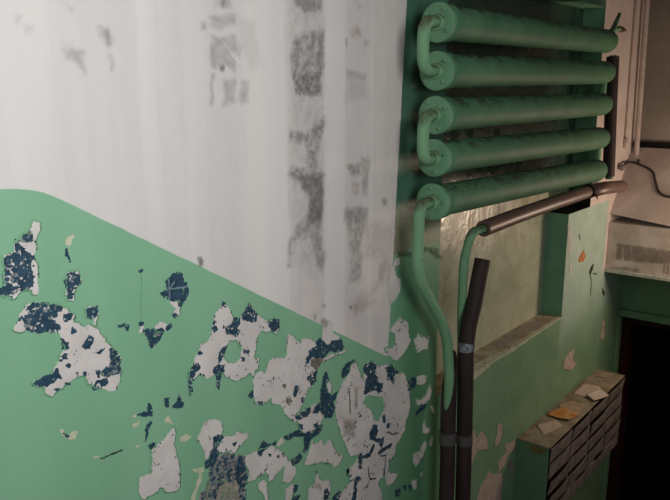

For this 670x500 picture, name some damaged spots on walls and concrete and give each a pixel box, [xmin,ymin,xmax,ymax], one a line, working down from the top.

peeling [0,219,122,398]
peeling [139,272,189,348]
peeling [388,257,401,304]
peeling [563,348,577,371]
peeling [131,301,437,500]
peeling [472,422,516,500]